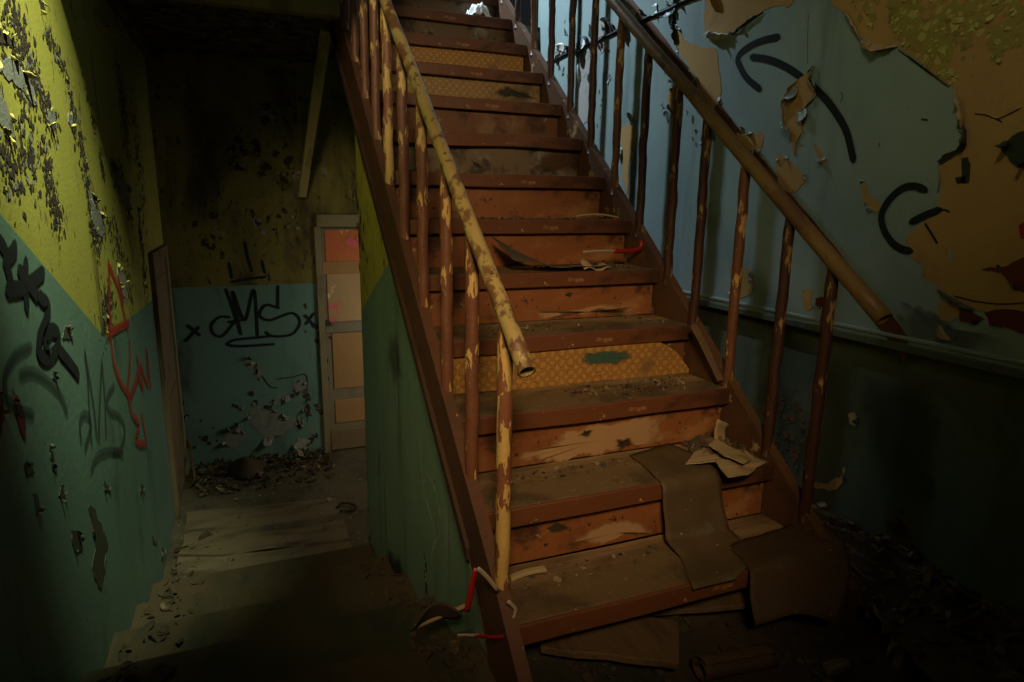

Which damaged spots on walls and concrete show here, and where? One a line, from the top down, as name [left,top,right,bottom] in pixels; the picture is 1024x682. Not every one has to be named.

peeling [662,0,793,109]
peeling [0,0,148,355]
peeling [776,65,816,193]
peeling [832,0,1024,334]
peeling [182,380,323,450]
peeling [71,505,109,590]